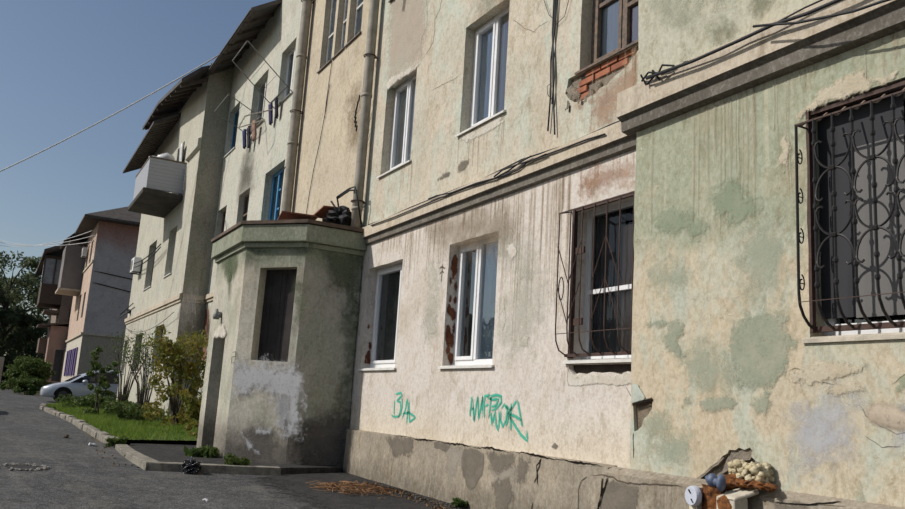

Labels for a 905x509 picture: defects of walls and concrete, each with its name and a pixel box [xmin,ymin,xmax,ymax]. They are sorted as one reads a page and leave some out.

spalling [565,46,639,125]
spalling [567,364,653,455]